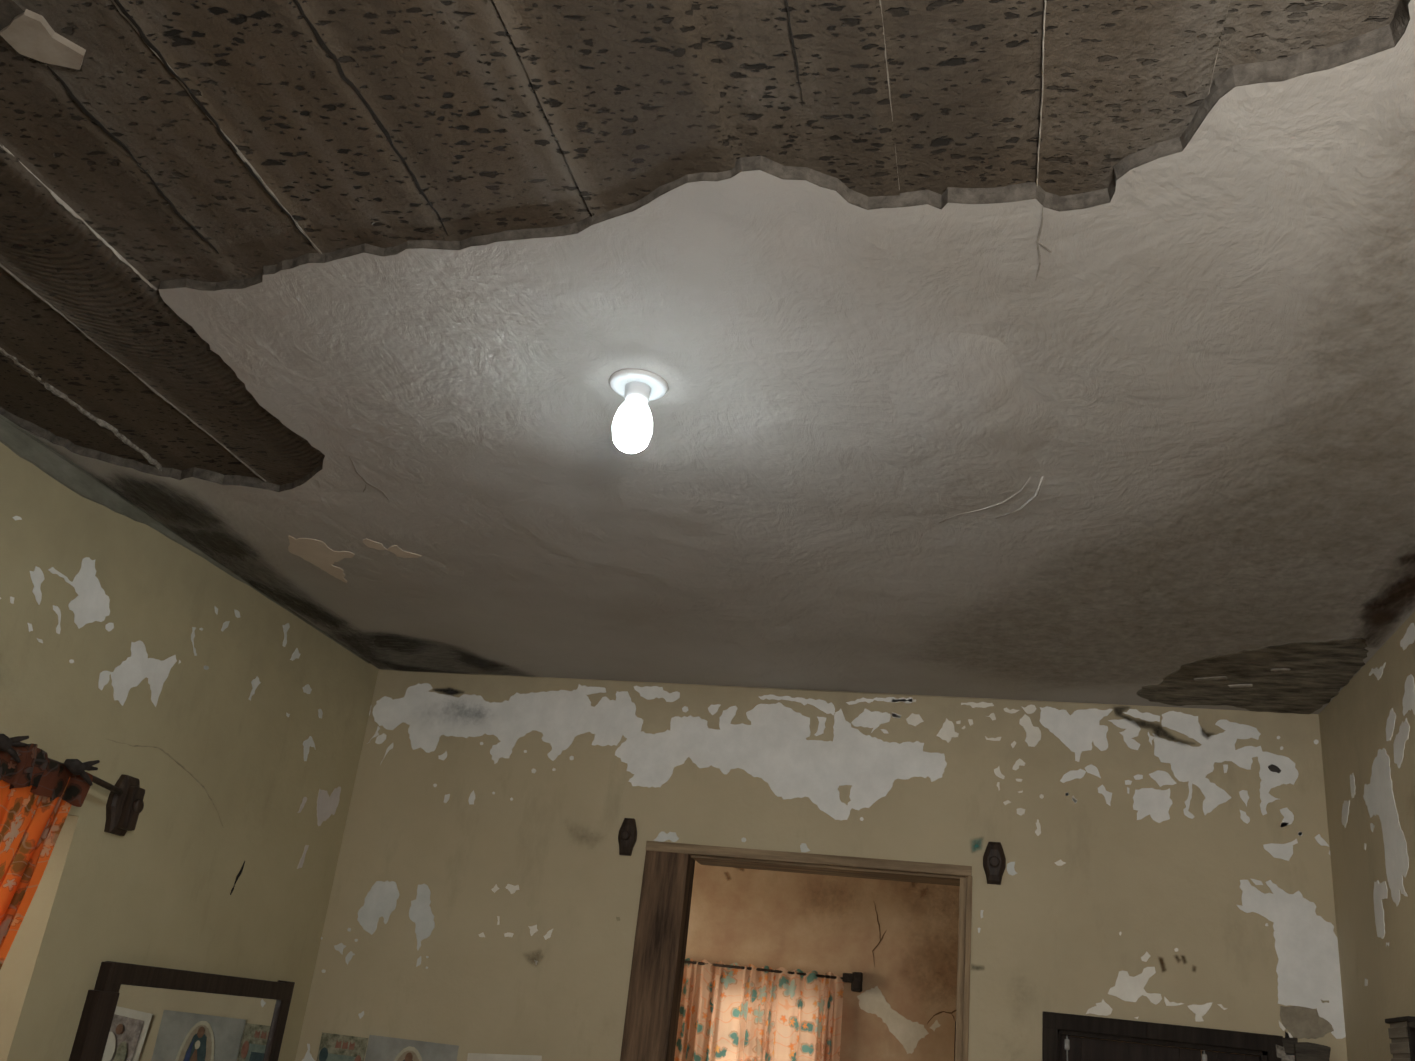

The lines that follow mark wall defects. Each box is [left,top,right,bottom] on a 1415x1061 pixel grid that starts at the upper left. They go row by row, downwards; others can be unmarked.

spalling [0,0,1401,485]
peeling [28,557,114,643]
peeling [98,627,209,707]
peeling [282,623,301,661]
damp [114,479,516,695]
peeling [288,535,421,583]
peeling [1400,623,1415,650]
peeling [368,638,1386,861]
peeling [1342,674,1415,946]
peeling [321,881,435,969]
peeling [1237,879,1346,1039]